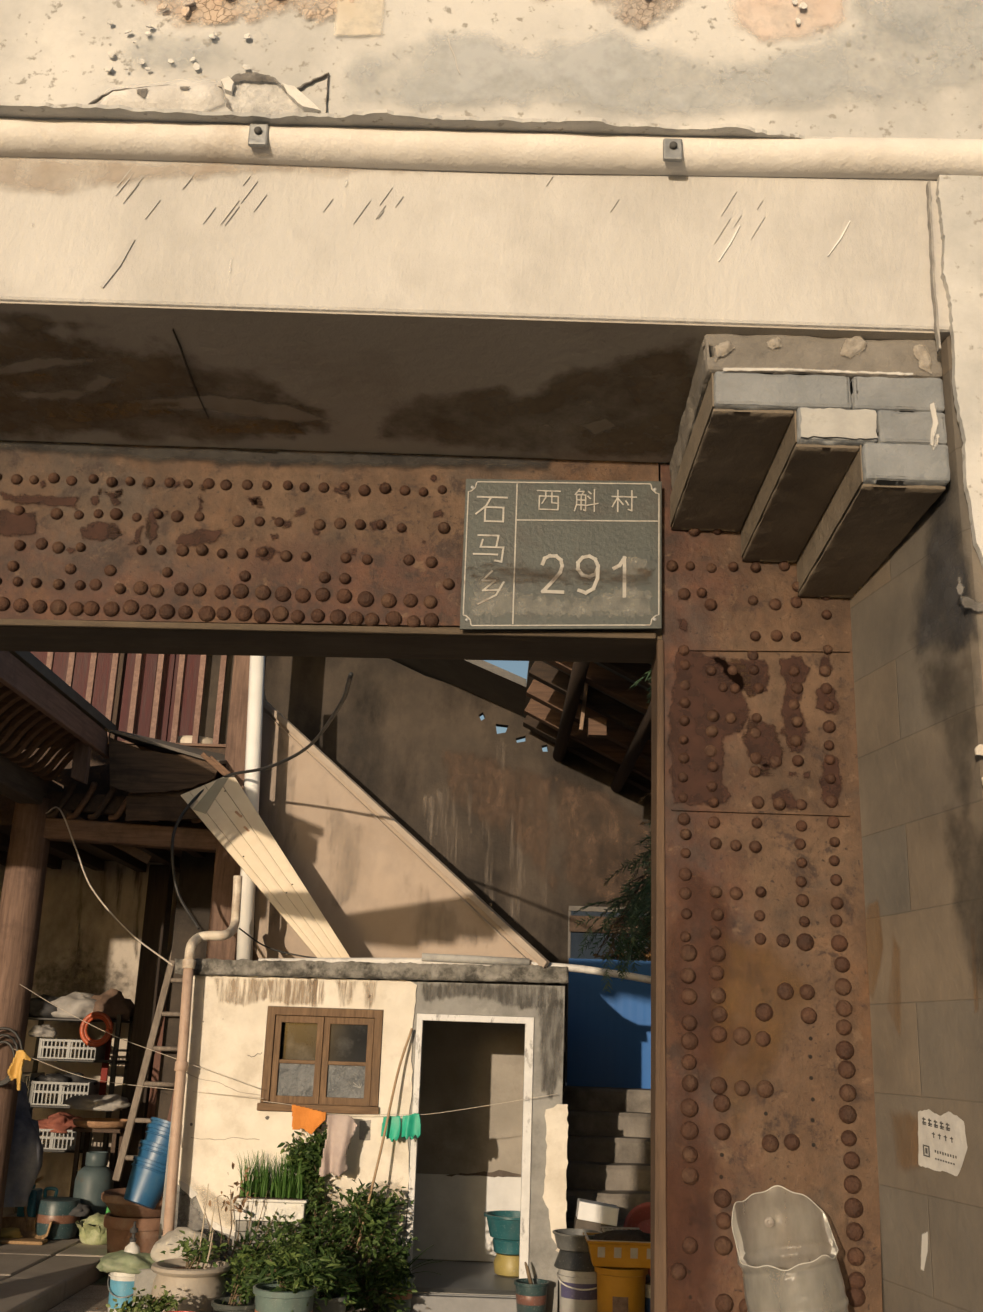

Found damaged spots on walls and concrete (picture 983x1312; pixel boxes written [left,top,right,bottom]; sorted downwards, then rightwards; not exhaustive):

flaking render [143,0,383,39]
flaking render [620,0,678,28]
flaking render [735,0,842,38]
flaking render [221,64,321,115]
water stain [0,315,693,469]
peeling [667,651,842,809]
water stain [229,979,375,1006]
water stain [423,983,563,1097]
flaking render [543,1104,569,1252]
corrosion [666,1160,709,1312]